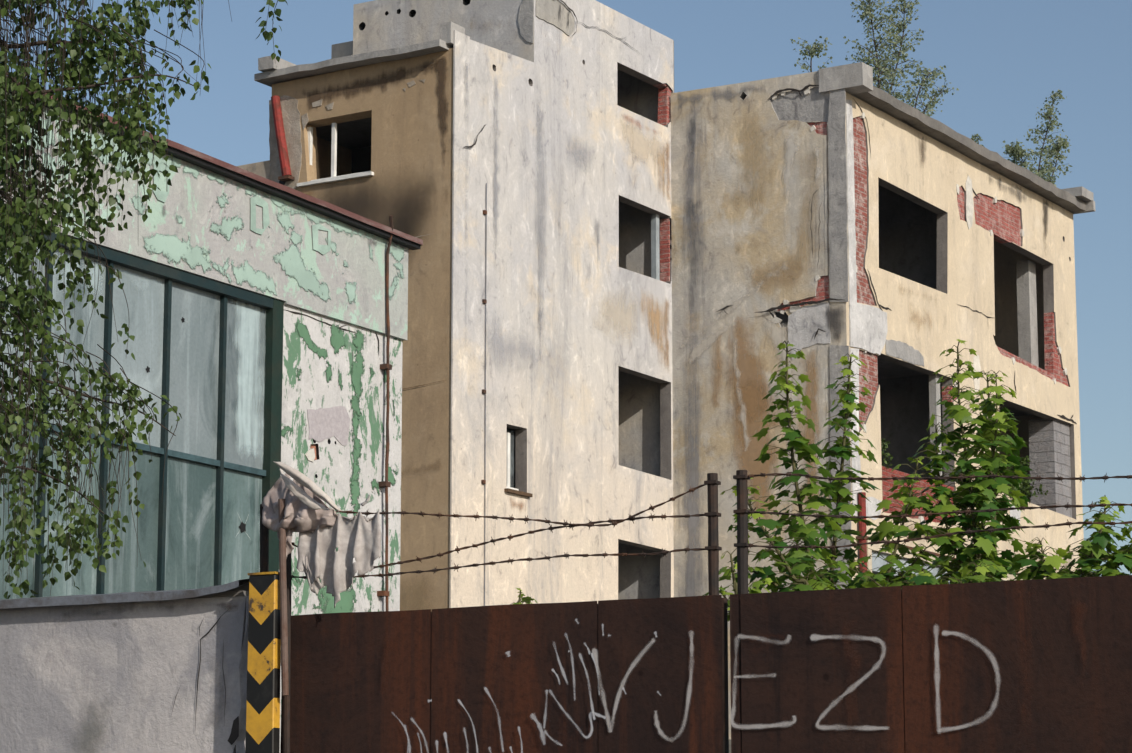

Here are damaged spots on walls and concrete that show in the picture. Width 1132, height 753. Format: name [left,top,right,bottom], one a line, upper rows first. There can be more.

flaking render [70,95,404,304]
peeling [295,321,398,516]
damp [308,59,447,134]
damp [679,95,700,260]
damp [684,384,702,597]
crack [716,133,843,339]
damp [767,321,792,381]
flaking render [853,112,875,306]
flaking render [859,350,878,433]
crack [868,271,892,311]
flaking render [956,184,1024,246]
flaking render [997,312,1069,387]